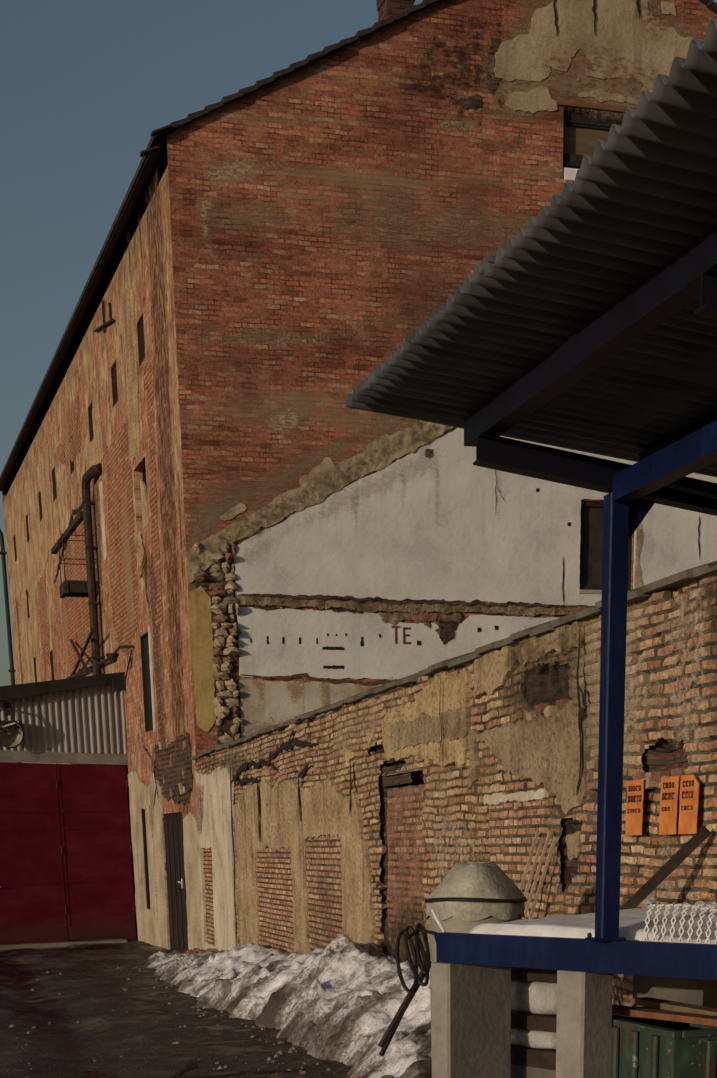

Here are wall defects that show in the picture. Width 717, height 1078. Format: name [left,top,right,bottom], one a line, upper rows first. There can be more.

crack [551,0,559,37]
crack [590,0,598,35]
peeling [460,0,704,129]
peeling [299,457,335,486]
flaking render [377,611,462,645]
spalling [153,541,252,805]
peeling [233,621,595,956]
spalling [633,738,689,790]